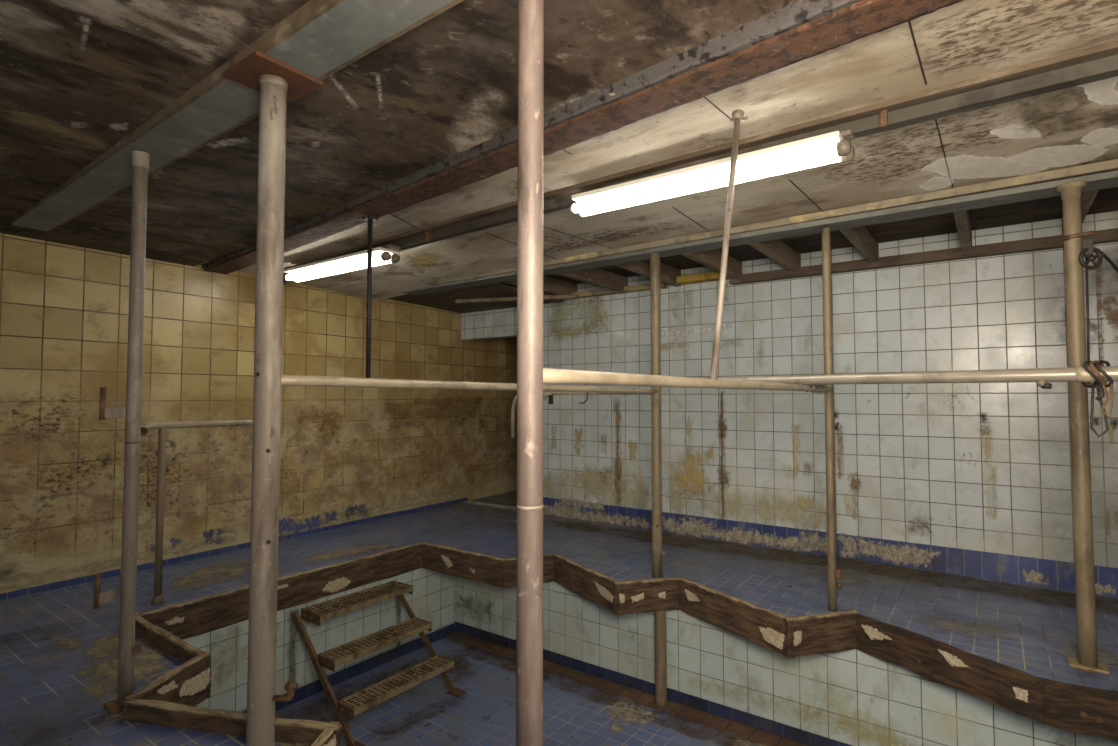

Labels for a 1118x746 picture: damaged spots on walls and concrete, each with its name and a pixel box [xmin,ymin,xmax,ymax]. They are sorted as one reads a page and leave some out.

mould [935,0,1118,71]
damp [1,110,106,149]
damp [829,76,1118,191]
mould [39,457,116,507]